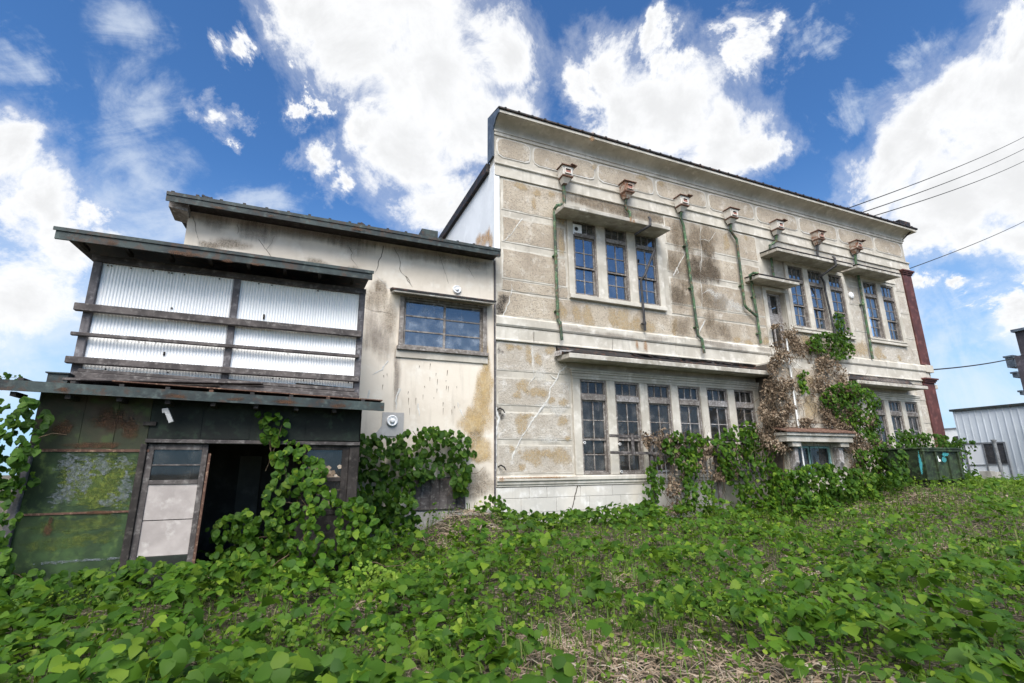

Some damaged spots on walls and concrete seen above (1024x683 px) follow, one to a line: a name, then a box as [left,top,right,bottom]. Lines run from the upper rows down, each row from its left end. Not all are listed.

crack [349,246,412,313]
damp [580,199,744,338]
corrosion [112,380,383,407]
damp [461,347,503,497]
crack [496,337,567,469]